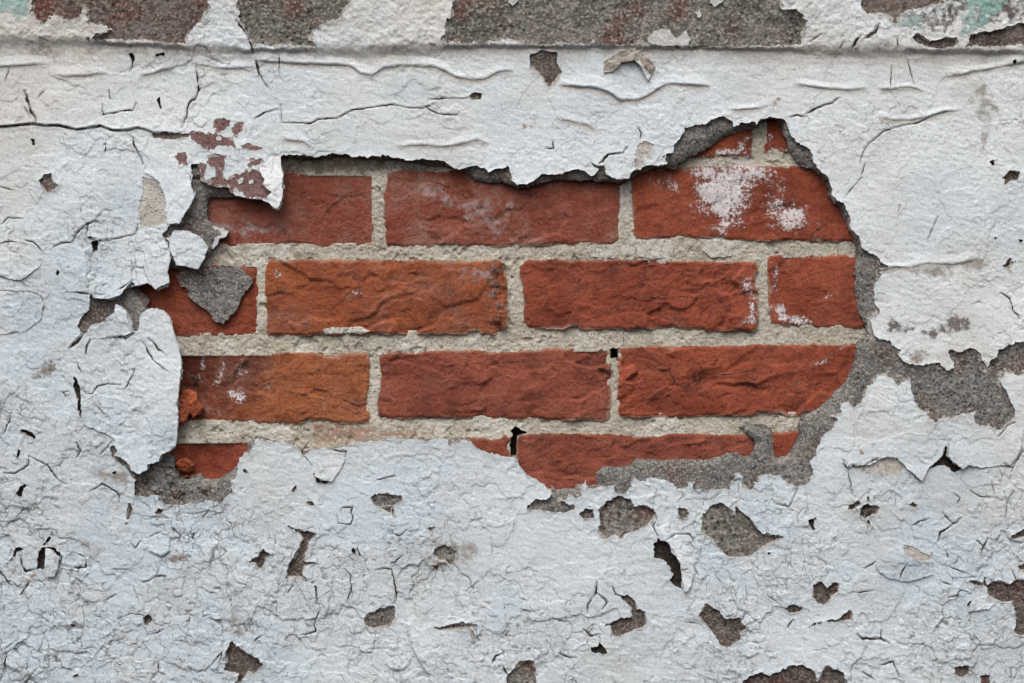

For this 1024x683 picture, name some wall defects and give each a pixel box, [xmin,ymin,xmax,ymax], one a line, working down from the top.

crack [0,70,149,163]
peeling [0,0,211,45]
crack [237,21,466,124]
peeling [441,0,807,88]
crack [810,26,914,84]
leakage [689,137,807,235]
crack [1,213,137,250]
crack [63,334,167,414]
flaking render [75,117,1024,599]
crack [914,451,1024,597]
peeling [968,564,1024,636]
peeling [224,641,263,683]